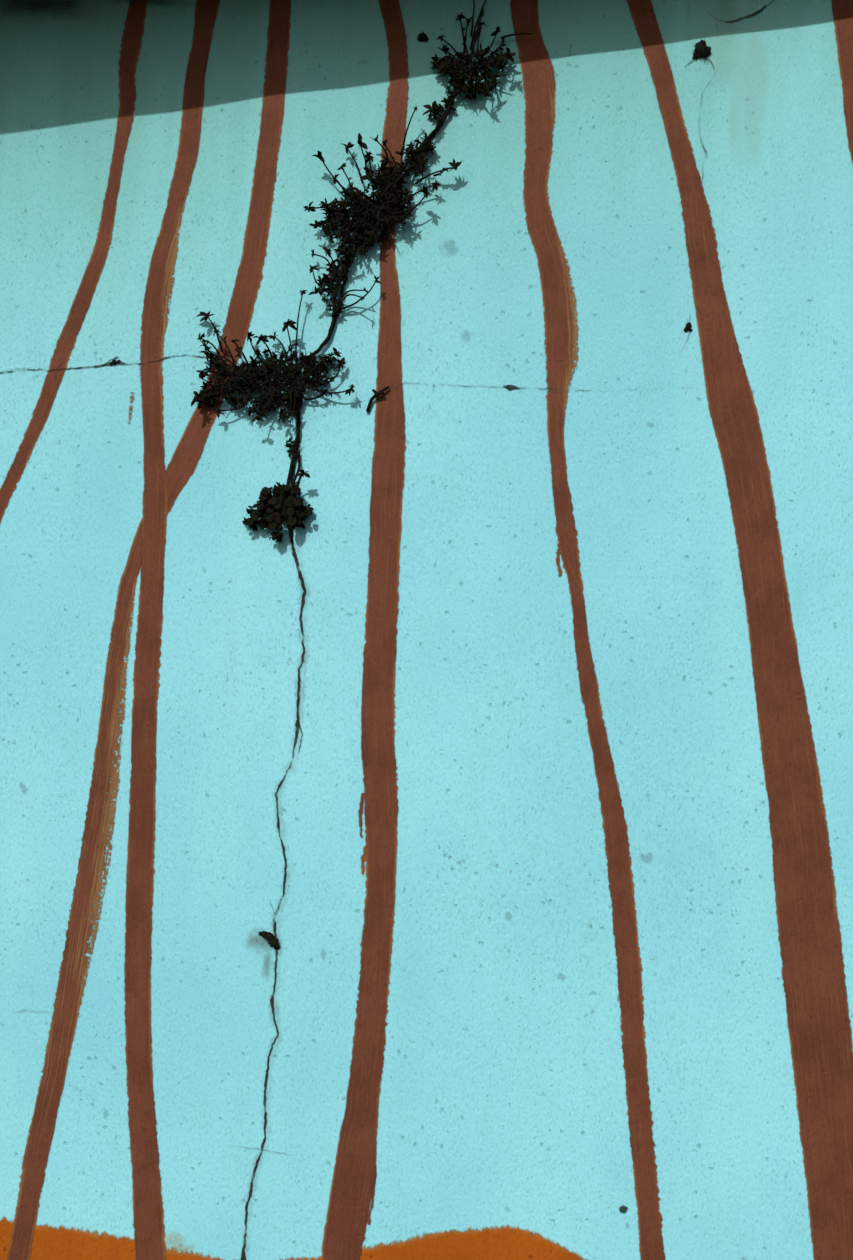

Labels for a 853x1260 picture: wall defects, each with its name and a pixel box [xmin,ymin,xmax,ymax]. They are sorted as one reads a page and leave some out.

crack [465,8,484,64]
crack [405,98,455,172]
crack [0,354,206,374]
crack [290,232,365,487]
crack [503,383,549,391]
crack [240,529,306,1260]